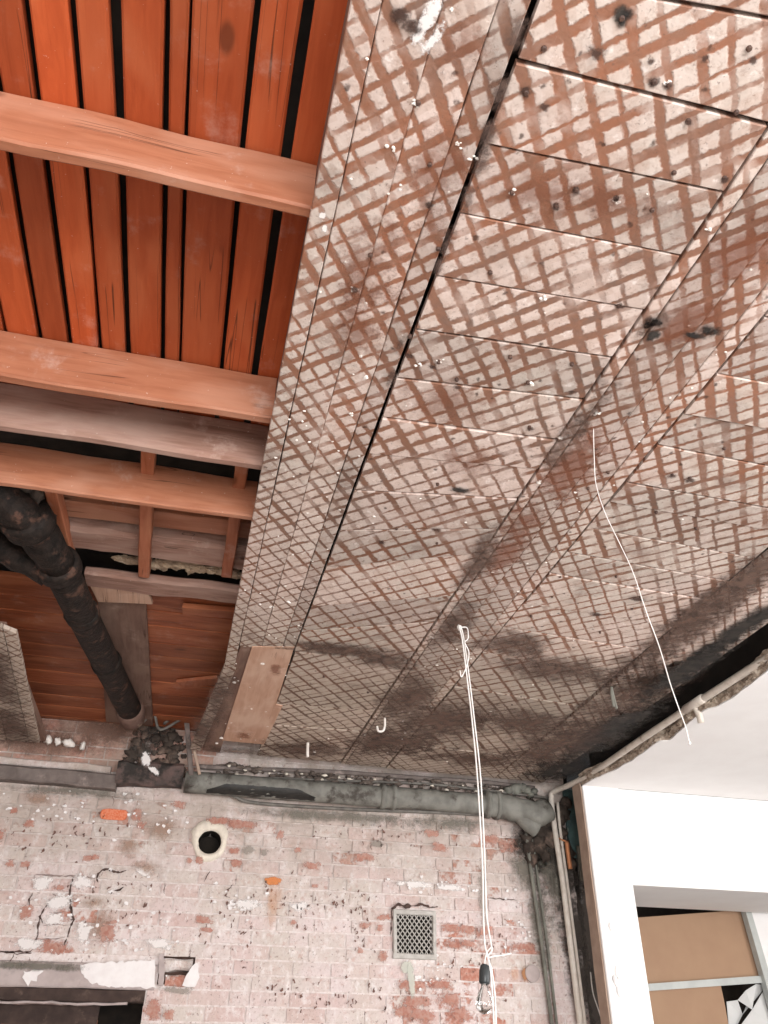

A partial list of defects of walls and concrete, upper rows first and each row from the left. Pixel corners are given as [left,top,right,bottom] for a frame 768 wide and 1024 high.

leakage [422,21,446,53]
leakage [457,535,498,590]
leakage [274,557,768,783]
spalling [578,649,768,785]
crack [0,868,127,961]
spalling [0,792,391,987]